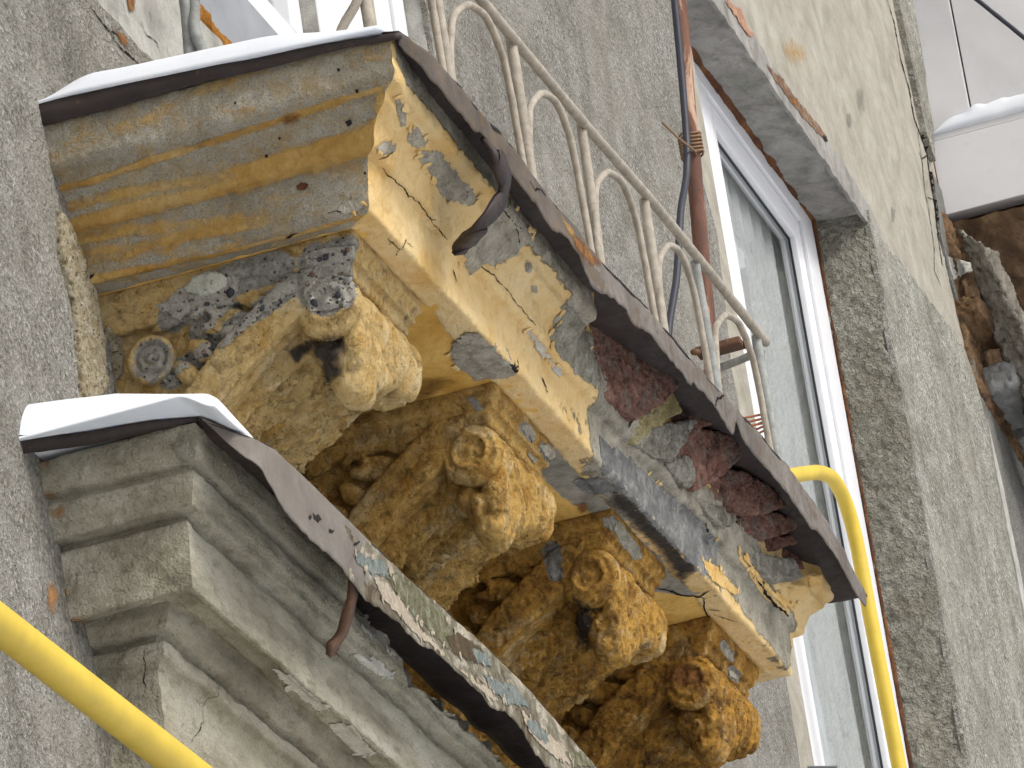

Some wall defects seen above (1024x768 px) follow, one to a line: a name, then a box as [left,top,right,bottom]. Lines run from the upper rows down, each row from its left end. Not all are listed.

spalling [156,244,356,387]
leakage [289,338,344,387]
crack [379,151,447,239]
peeling [376,95,483,207]
flaking render [444,333,520,381]
crack [453,265,536,325]
peeling [464,202,536,276]
crack [887,0,943,280]
flaking render [943,256,972,280]
spalling [522,304,823,610]
peeling [353,549,595,768]